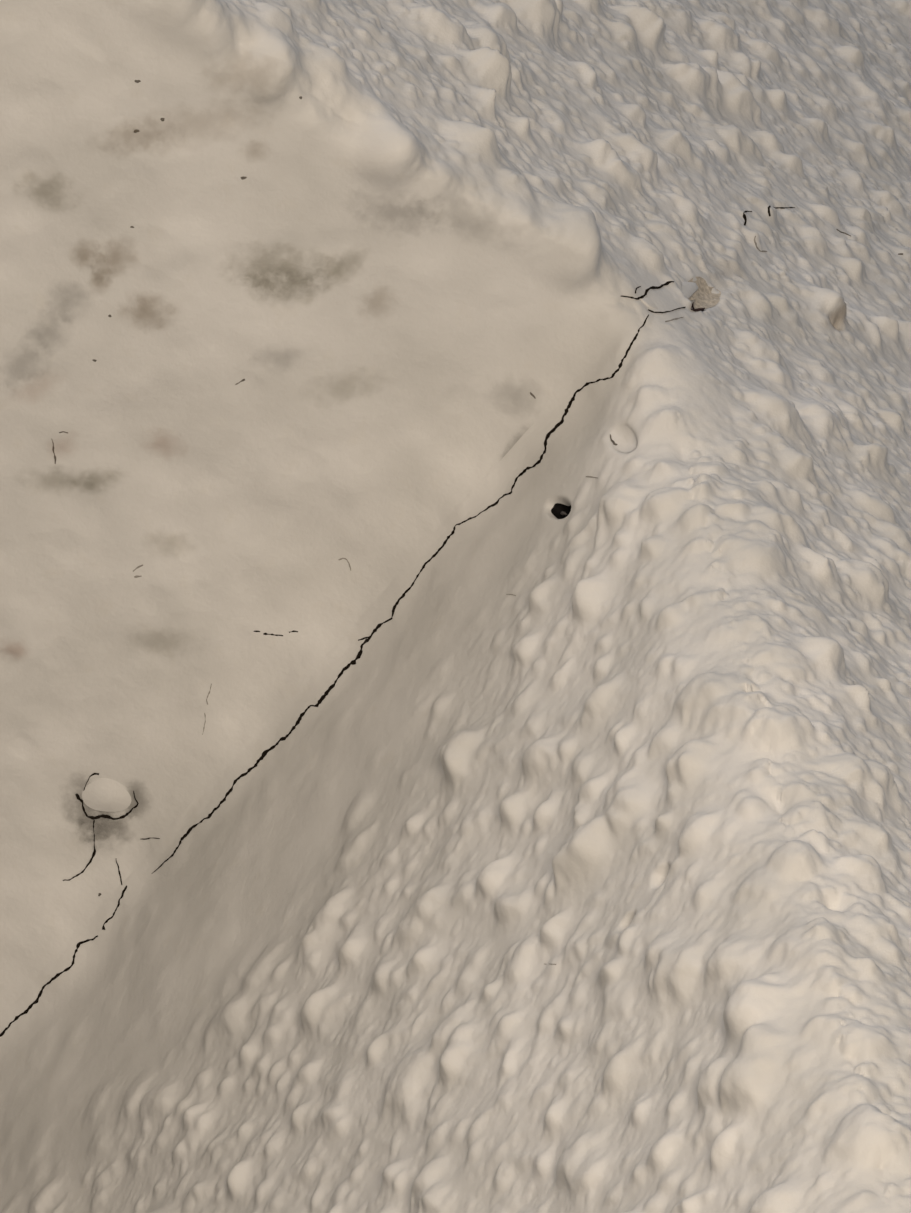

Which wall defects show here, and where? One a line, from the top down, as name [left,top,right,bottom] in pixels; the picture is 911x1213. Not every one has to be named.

crack [0,281,685,1037]